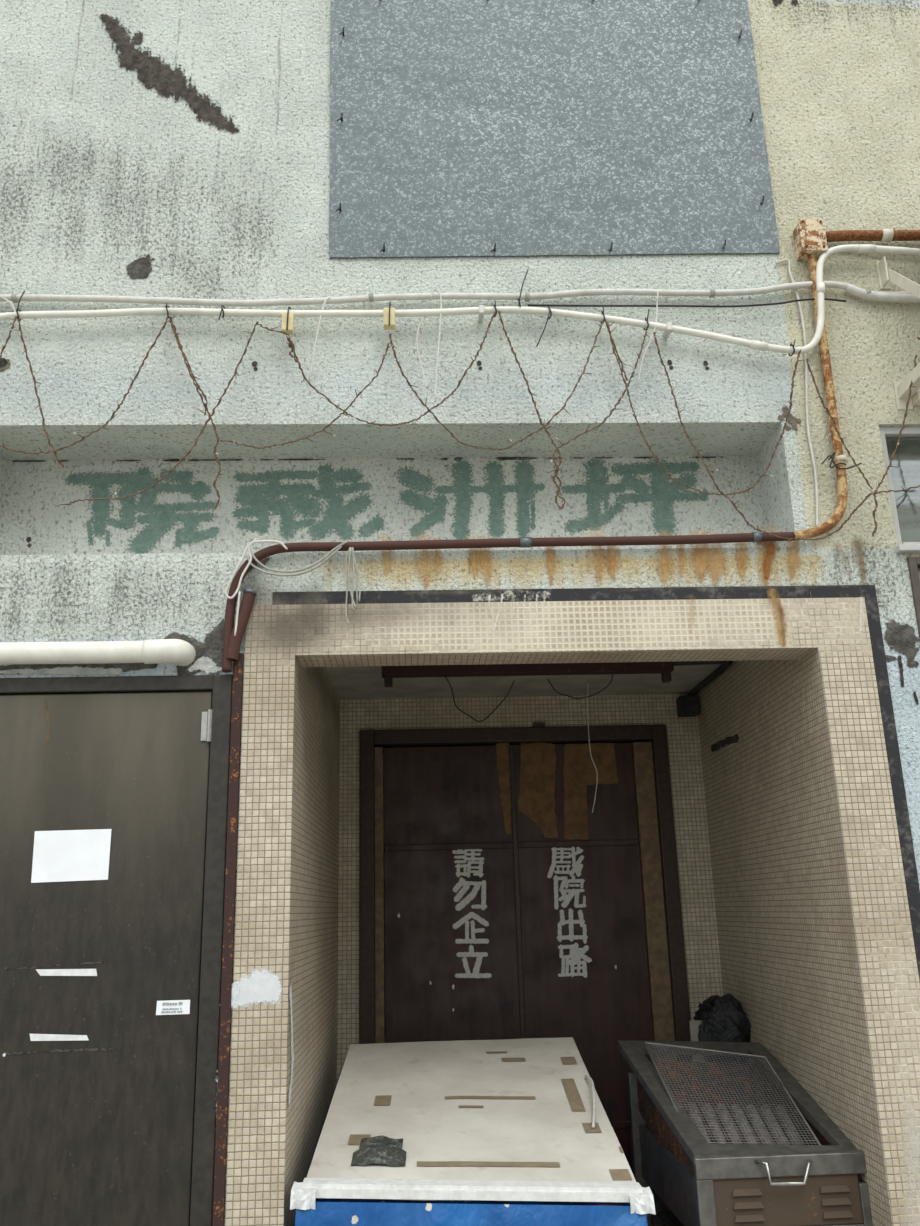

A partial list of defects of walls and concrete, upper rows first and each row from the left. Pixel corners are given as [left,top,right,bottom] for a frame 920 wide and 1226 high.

corrosion [546,546,554,586]
corrosion [660,533,723,584]
corrosion [737,531,798,645]